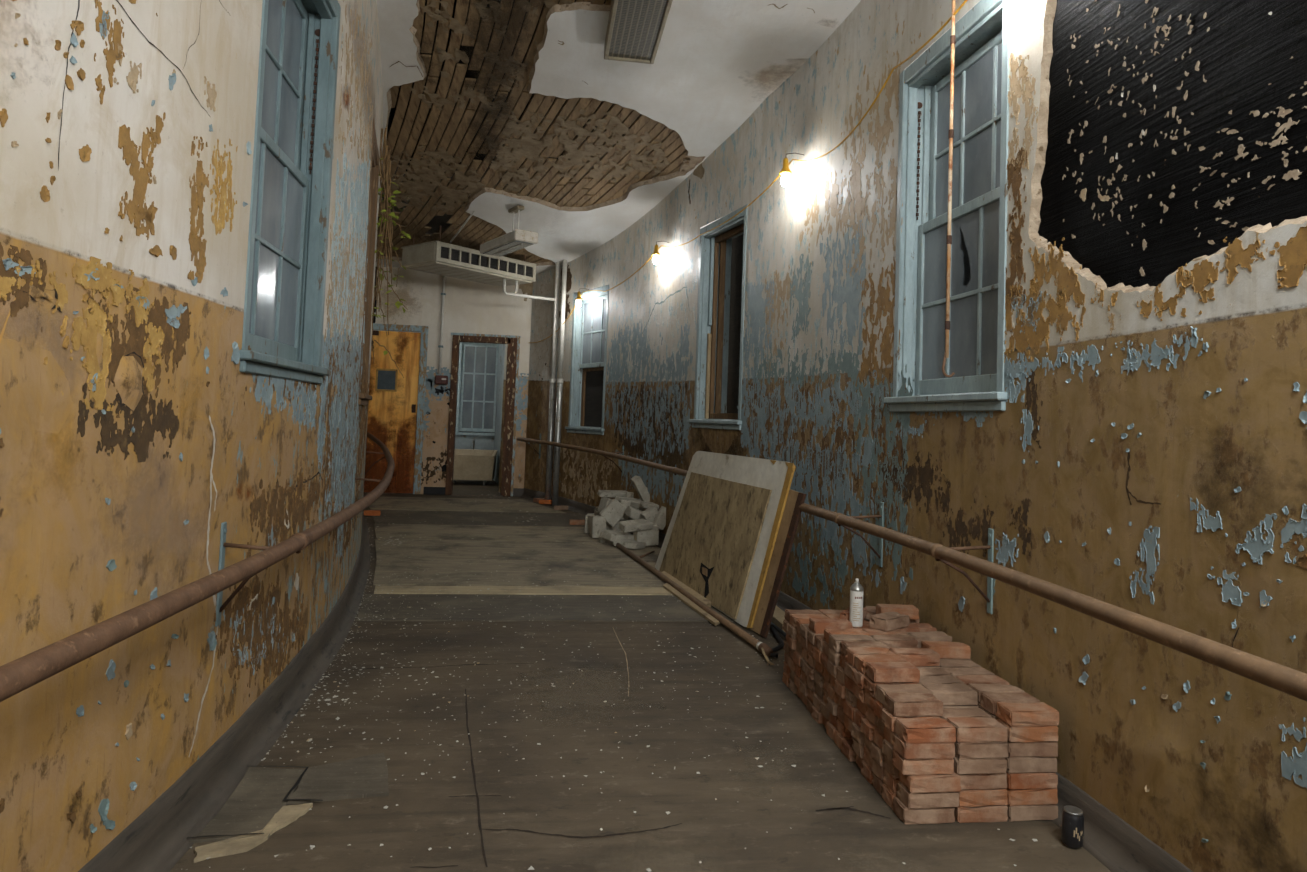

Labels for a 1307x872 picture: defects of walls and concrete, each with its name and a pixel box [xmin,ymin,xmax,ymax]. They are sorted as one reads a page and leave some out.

crack [58,0,80,170]
peeling [54,0,142,104]
crack [116,0,229,116]
peeling [40,161,56,202]
peeling [79,144,92,162]
peeling [104,76,252,286]
spalling [0,242,191,462]
peeling [231,0,705,568]
spalling [737,0,1307,609]
peeling [1190,497,1307,629]
peeling [207,568,305,697]
peeling [1279,717,1307,788]